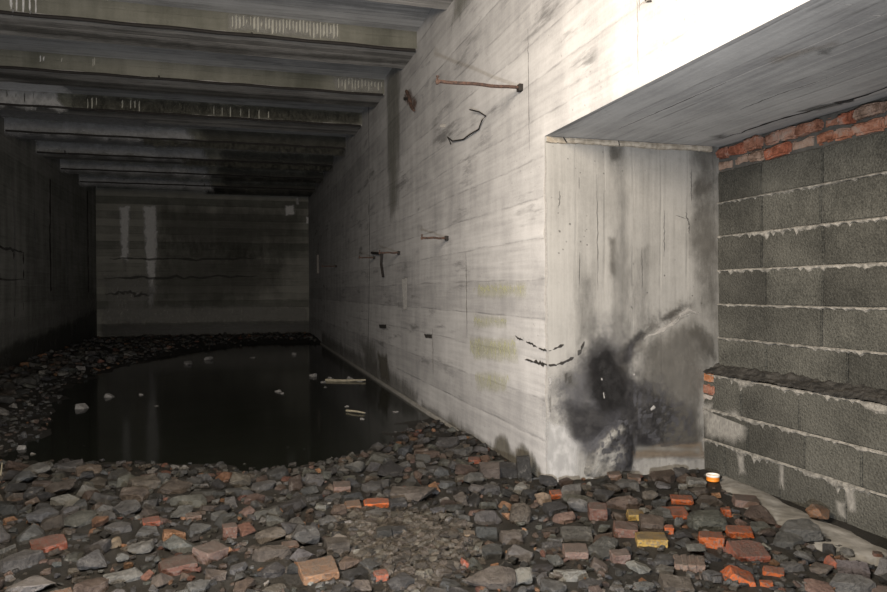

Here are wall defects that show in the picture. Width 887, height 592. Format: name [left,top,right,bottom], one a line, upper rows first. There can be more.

crack [725,87,887,138]
crack [516,336,585,367]